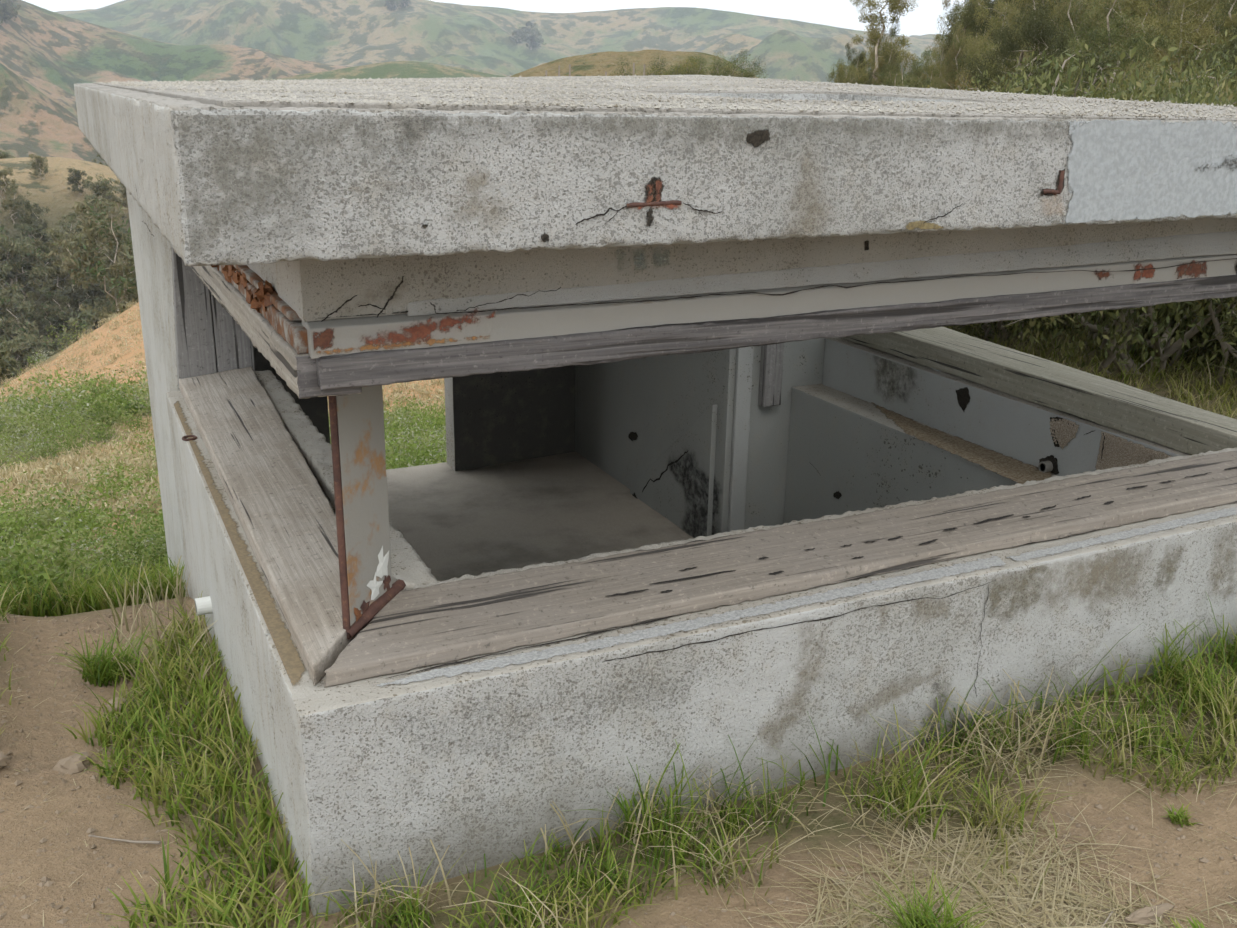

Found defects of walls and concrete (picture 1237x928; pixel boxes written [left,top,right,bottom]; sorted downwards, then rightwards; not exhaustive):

crack [575,206,627,225]
rust [626,177,682,227]
crack [684,203,722,216]
rust [1041,169,1065,196]
peeling [1065,119,1237,223]
crack [321,276,404,322]
rust [313,309,495,354]
water stain [871,402,1052,484]
spalling [1095,431,1172,470]
water stain [669,454,719,538]
peeling [354,546,391,621]
water stain [992,567,1040,614]